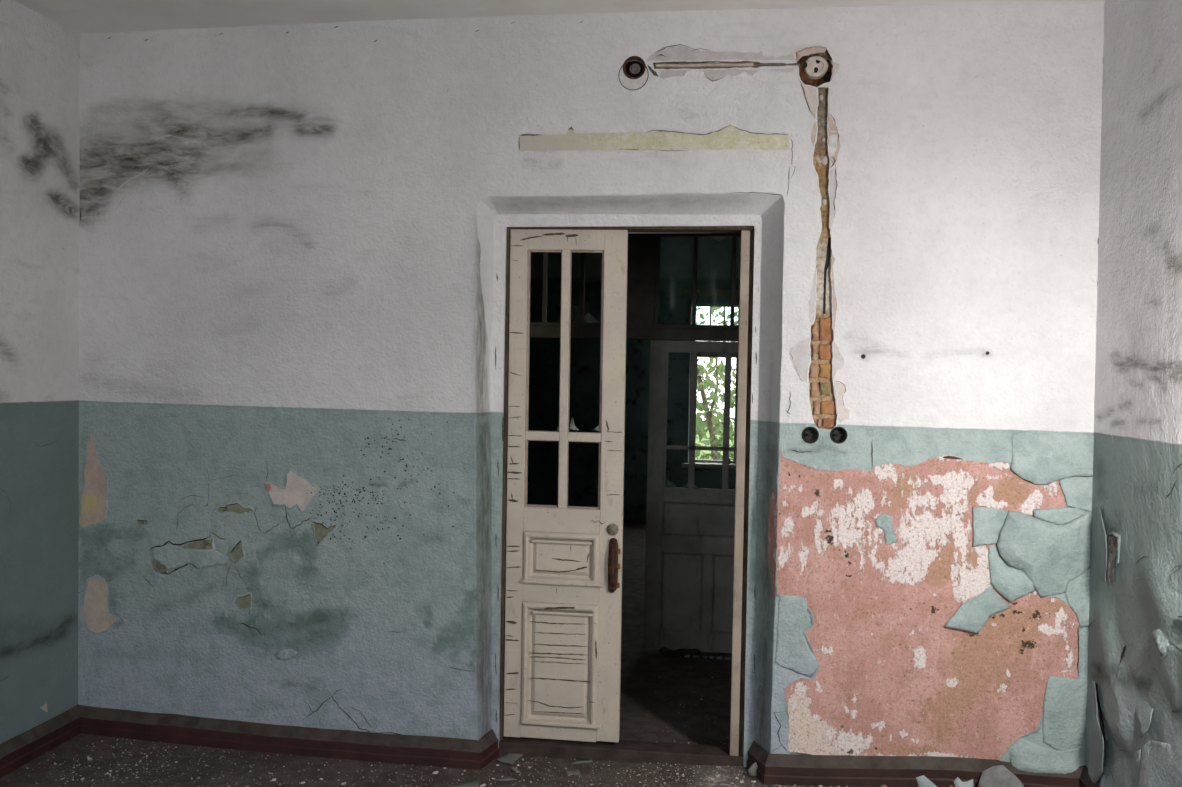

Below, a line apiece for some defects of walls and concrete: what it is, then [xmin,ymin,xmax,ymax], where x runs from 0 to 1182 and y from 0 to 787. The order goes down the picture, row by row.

peeling [518,124,791,154]
peeling [646,44,841,230]
spalling [789,253,851,423]
peeling [79,436,109,529]
crack [254,507,309,535]
peeling [264,468,338,547]
peeling [1106,532,1121,585]
peeling [82,574,120,634]
peeling [768,446,1083,760]
crack [303,689,401,735]
peeling [1095,680,1108,740]